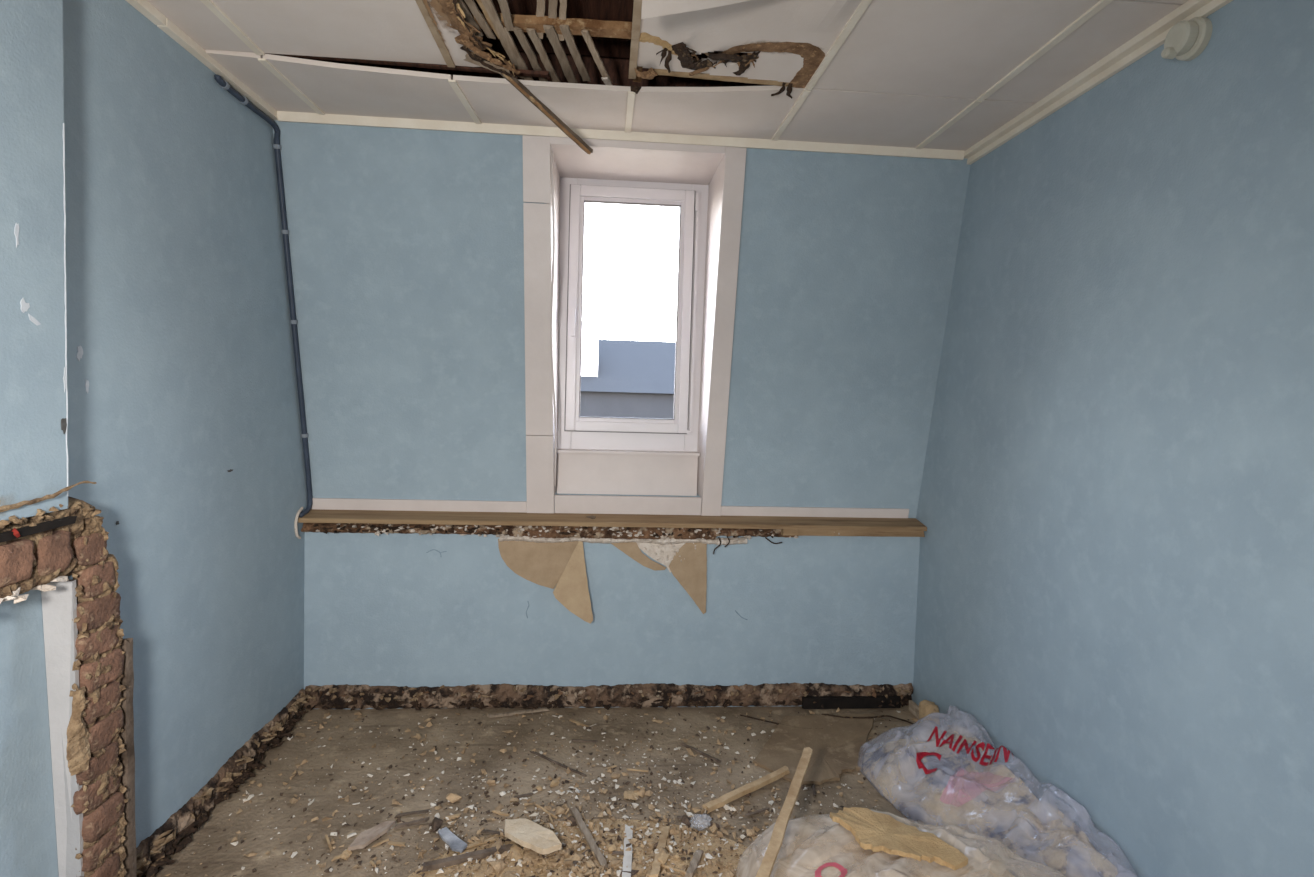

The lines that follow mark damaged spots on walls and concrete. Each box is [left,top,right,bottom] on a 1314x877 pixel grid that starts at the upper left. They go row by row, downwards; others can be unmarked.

peeling [656,42,761,76]
peeling [771,82,792,99]
spalling [294,507,925,562]
flaking render [0,481,129,877]